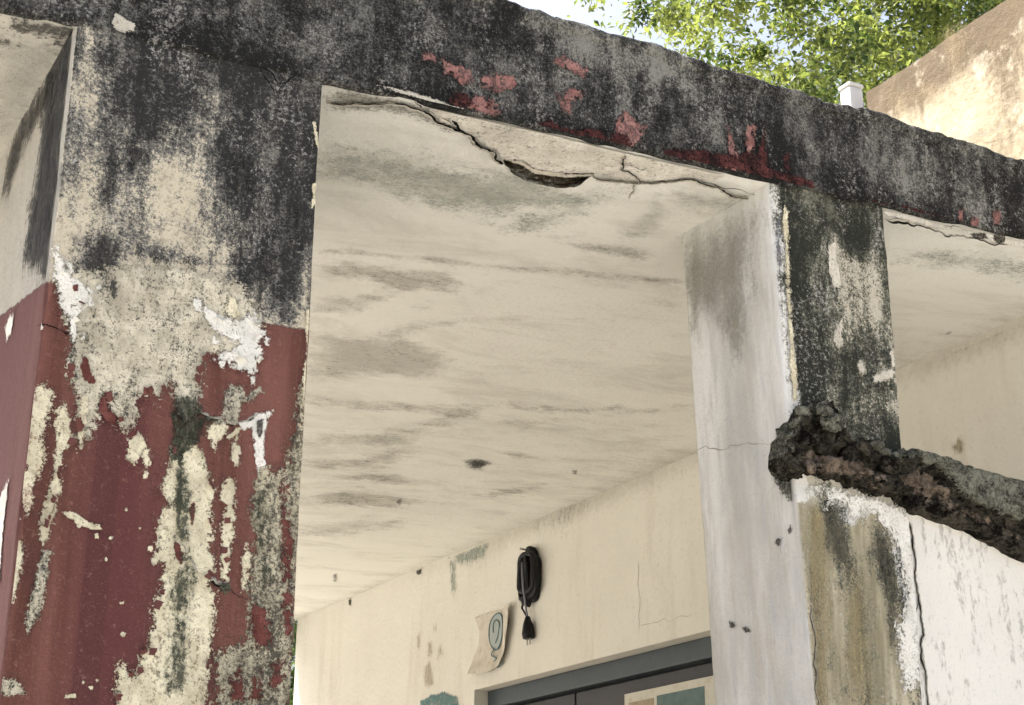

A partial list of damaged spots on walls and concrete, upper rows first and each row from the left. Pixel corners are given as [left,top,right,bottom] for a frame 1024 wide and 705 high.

crack [326,94,503,165]
crack [592,155,754,200]